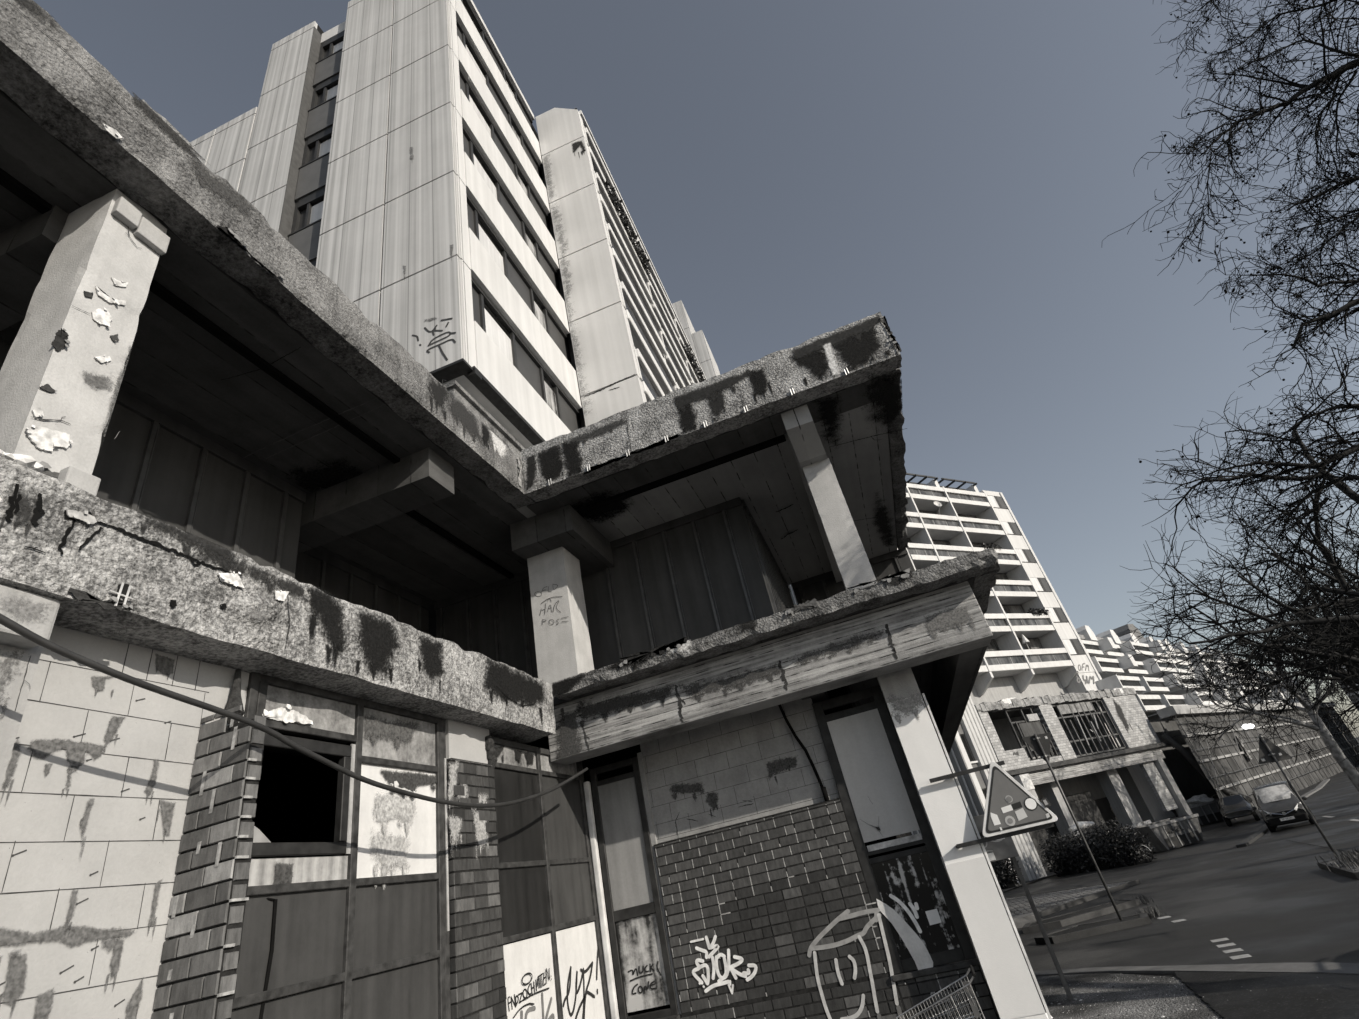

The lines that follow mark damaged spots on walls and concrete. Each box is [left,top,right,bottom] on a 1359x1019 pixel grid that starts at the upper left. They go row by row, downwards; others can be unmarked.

spalling [51,328,70,351]
peeling [84,277,128,363]
water stain [803,343,903,434]
peeling [25,407,73,479]
water stain [813,397,843,446]
water stain [309,616,340,670]
water stain [356,660,393,684]
water stain [229,719,238,750]
water stain [199,771,216,813]